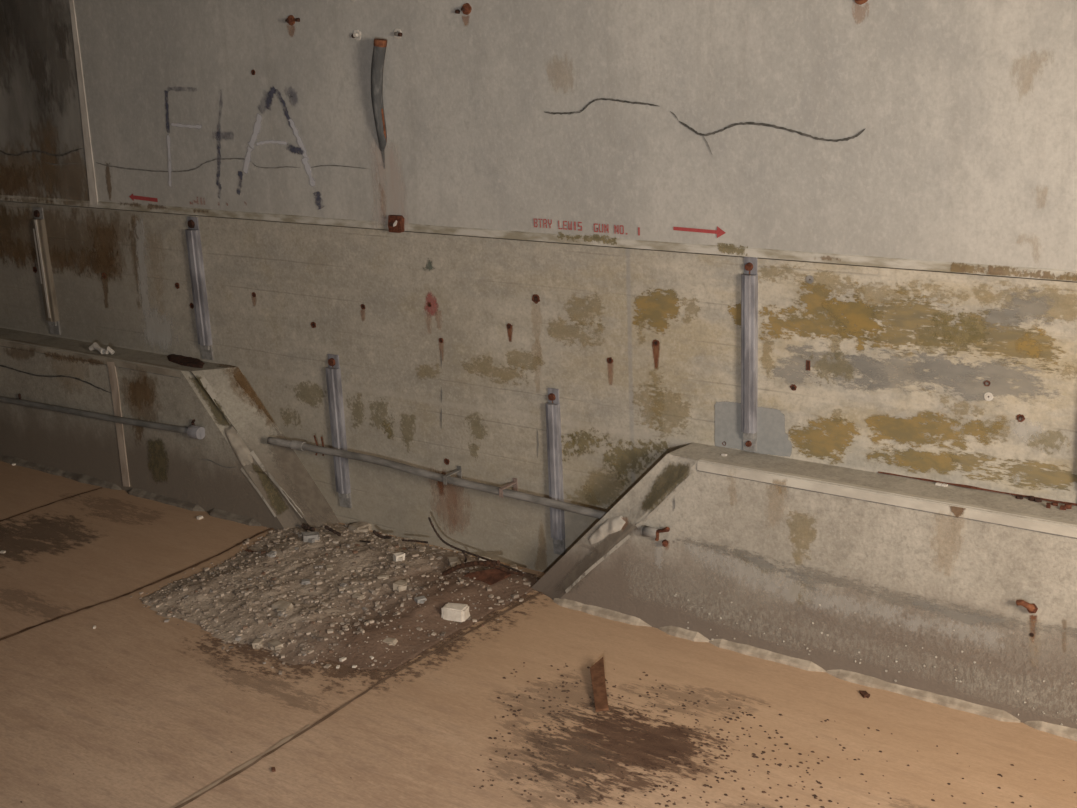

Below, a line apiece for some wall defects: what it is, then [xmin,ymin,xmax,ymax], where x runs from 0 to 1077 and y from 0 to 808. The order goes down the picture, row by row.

crack [545,98,866,154]
corrosion [652,343,660,369]
crack [0,365,111,393]